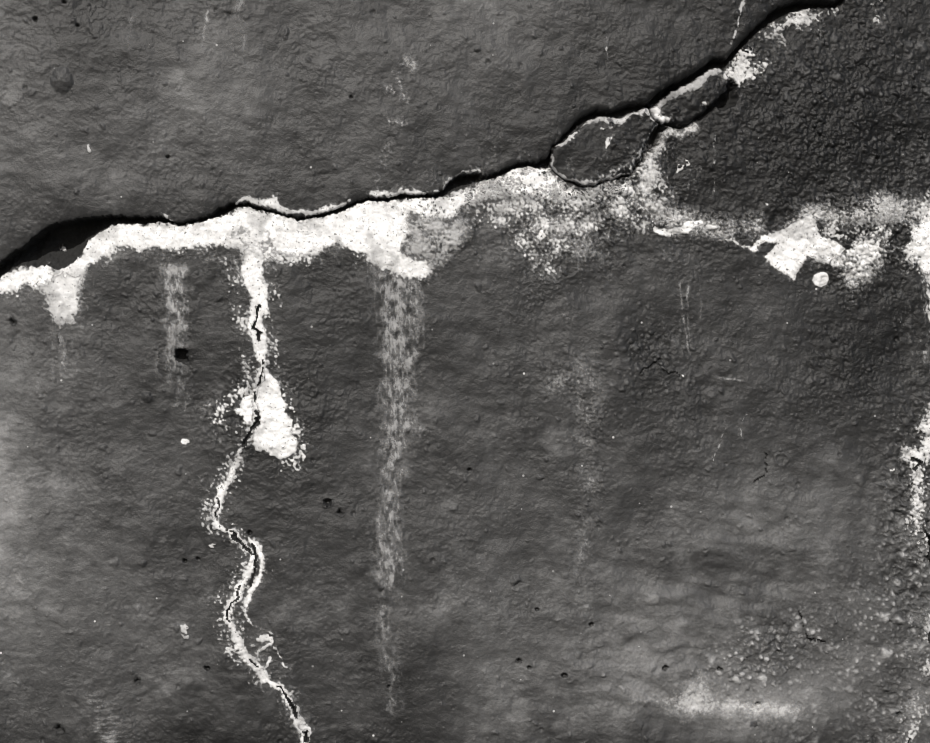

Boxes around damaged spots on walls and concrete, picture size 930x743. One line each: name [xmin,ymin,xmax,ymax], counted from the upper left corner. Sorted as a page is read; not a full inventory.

crack [200,227,312,743]
leakage [0,123,697,589]
leakage [371,604,395,681]
crack [0,0,844,278]